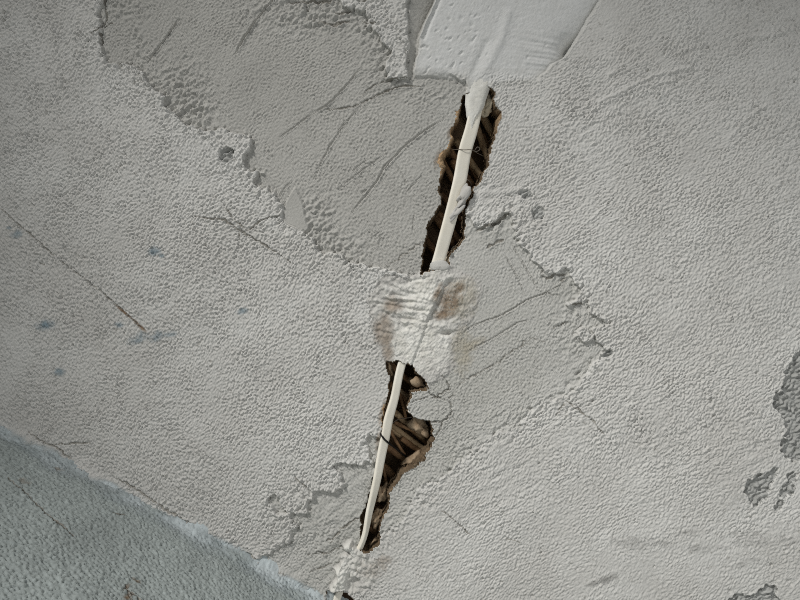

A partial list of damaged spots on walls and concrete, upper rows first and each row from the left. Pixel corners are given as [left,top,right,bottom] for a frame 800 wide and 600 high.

flaking render [97,0,467,276]
crack [327,76,421,110]
crack [2,209,146,331]
crack [194,208,291,263]
crack [307,302,582,572]
flaking render [379,212,613,535]
flaking render [743,467,797,511]
flaking render [773,351,800,462]